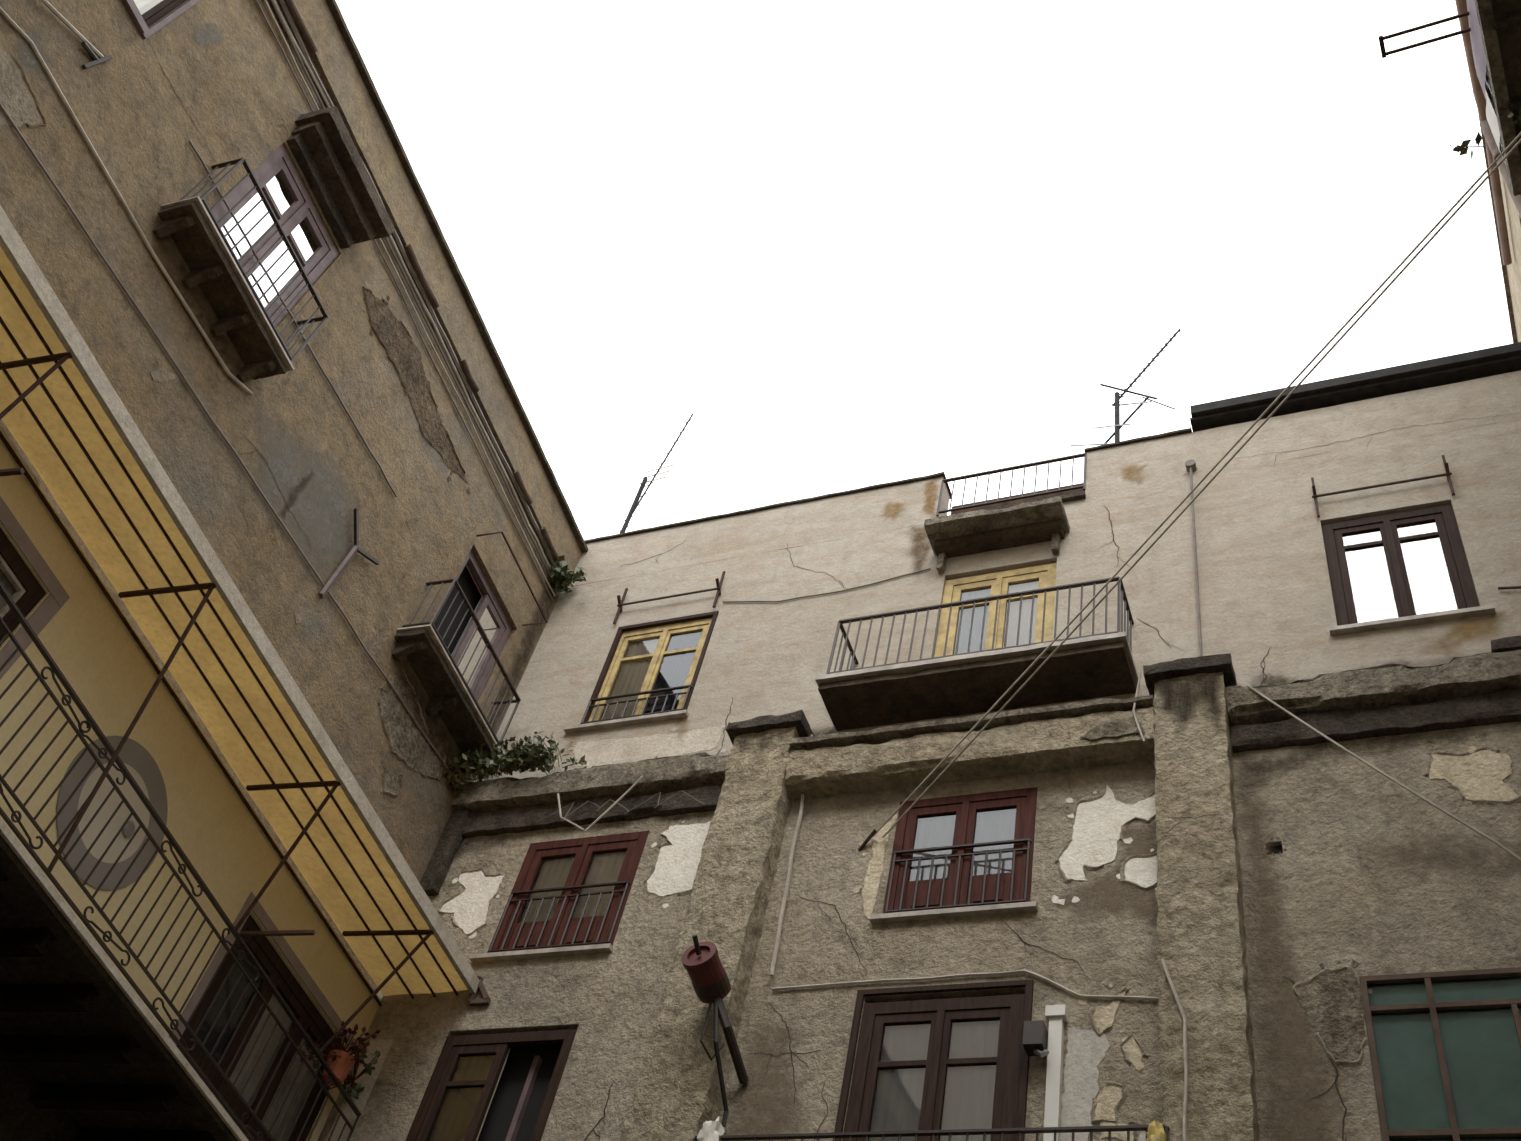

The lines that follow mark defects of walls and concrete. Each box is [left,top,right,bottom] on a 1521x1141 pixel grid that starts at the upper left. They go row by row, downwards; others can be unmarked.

peeling [1424,746,1521,805]
peeling [437,867,504,939]
peeling [643,821,710,909]
peeling [1052,785,1158,905]
flaking render [1078,983,1149,1072]
crack [584,1084,613,1141]
flaking render [1090,1081,1138,1141]
crack [1306,1057,1347,1141]